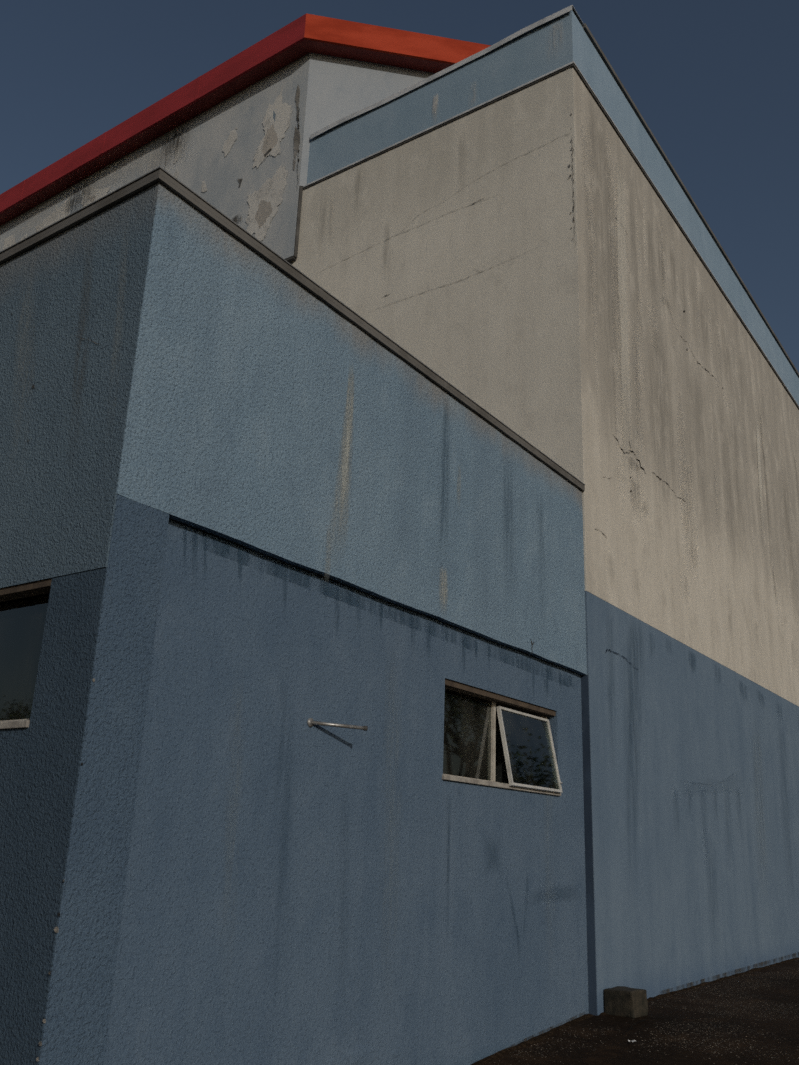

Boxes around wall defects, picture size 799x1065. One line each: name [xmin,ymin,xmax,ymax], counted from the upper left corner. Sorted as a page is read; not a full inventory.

peeling [246,85,300,241]
crack [609,434,687,502]